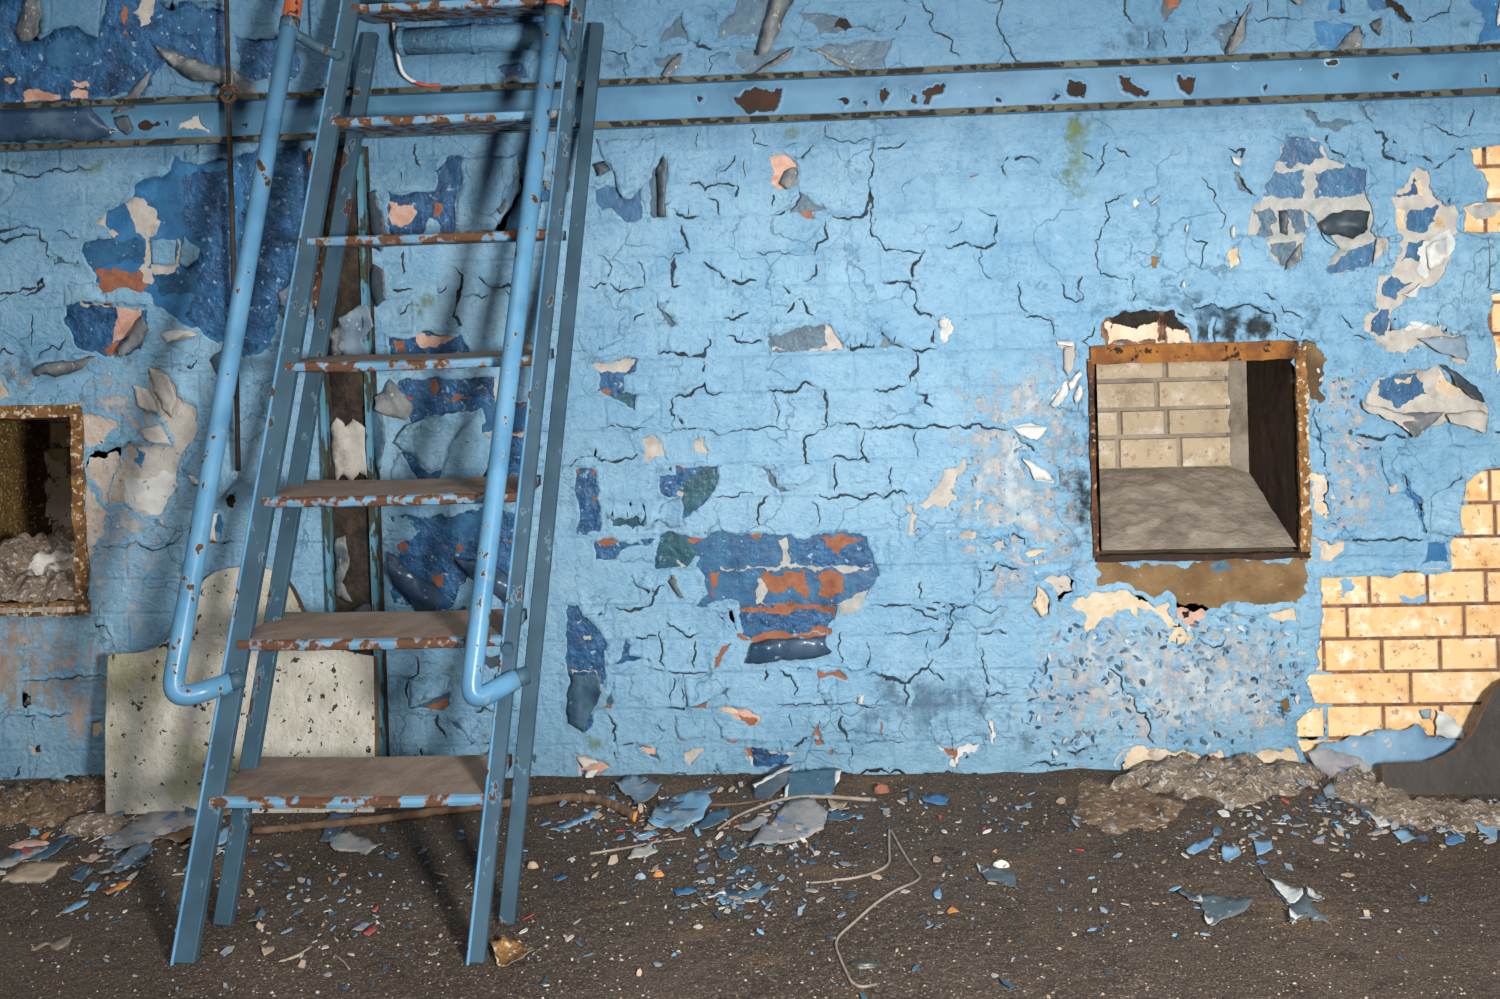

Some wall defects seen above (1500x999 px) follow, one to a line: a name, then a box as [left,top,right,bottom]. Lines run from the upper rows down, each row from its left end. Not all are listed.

crack [0,215,79,358]
peeling [0,0,284,563]
peeling [239,141,315,376]
peeling [334,503,483,612]
peeling [324,145,526,480]
crack [392,249,513,337]
peeling [549,342,889,860]
crack [566,126,1137,537]
crack [608,523,1159,775]
flaking render [899,101,1500,777]
crack [1193,143,1373,344]
crack [1312,405,1425,573]